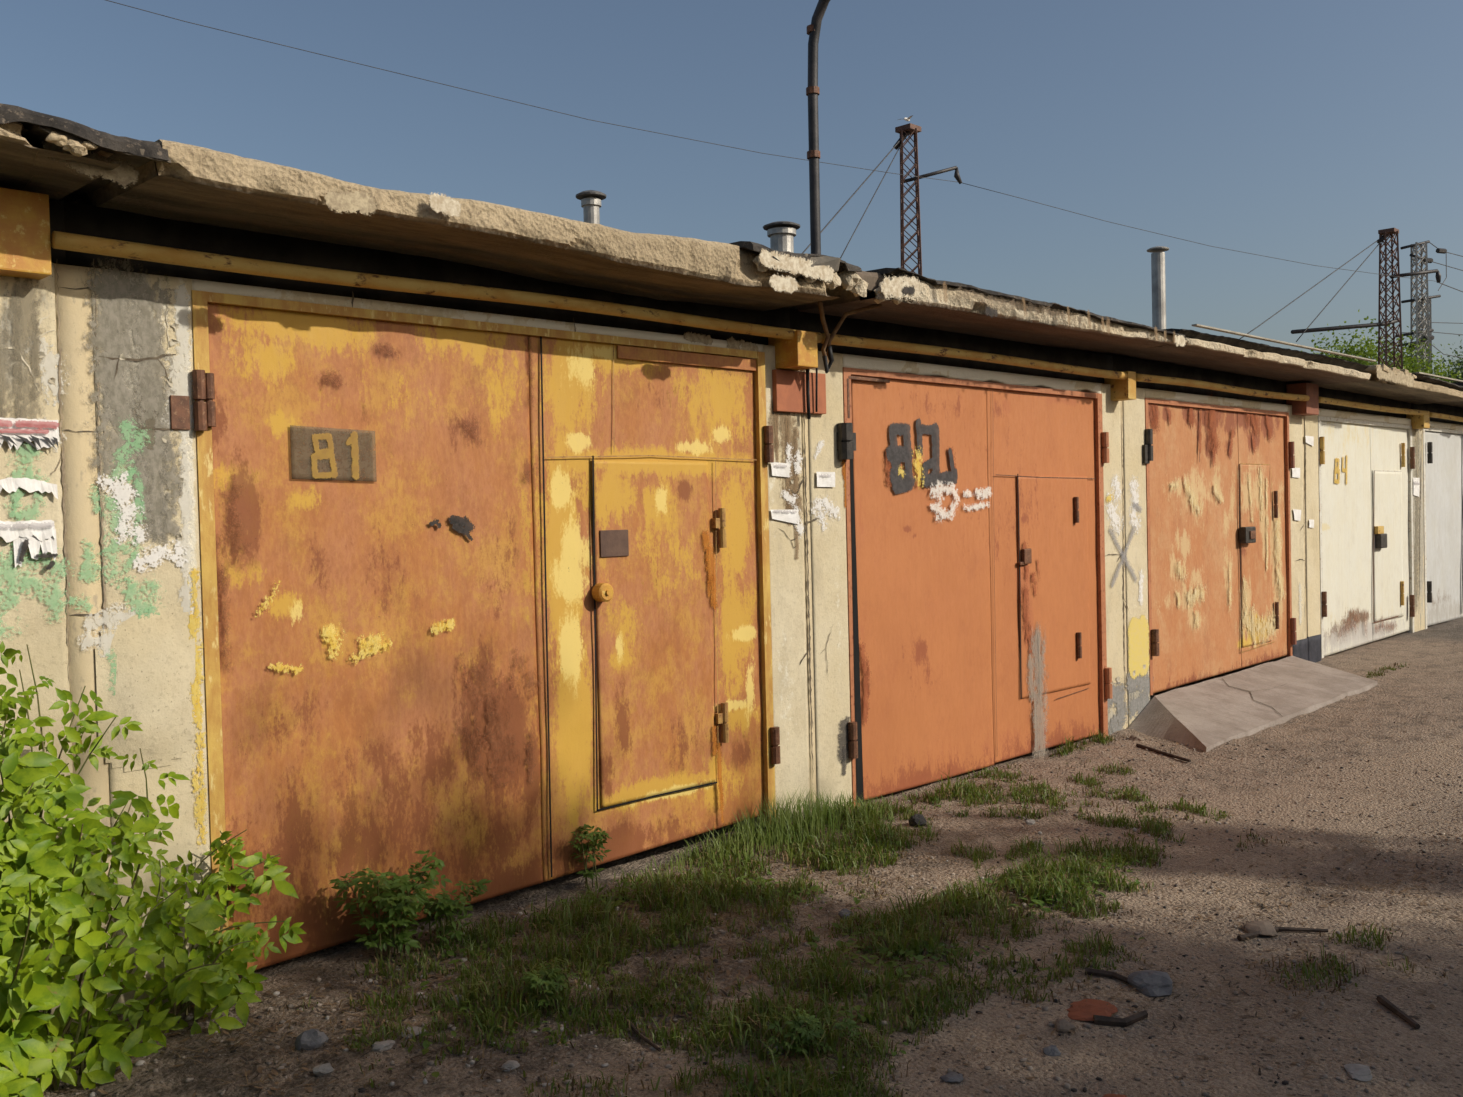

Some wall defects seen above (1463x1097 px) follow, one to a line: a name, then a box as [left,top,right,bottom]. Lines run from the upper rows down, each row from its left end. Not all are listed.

spalling [43,131,140,188]
spalling [753,248,921,305]
rust [1150,391,1273,467]
peeling [24,257,208,845]
rust [702,530,718,609]
rust [859,643,872,725]